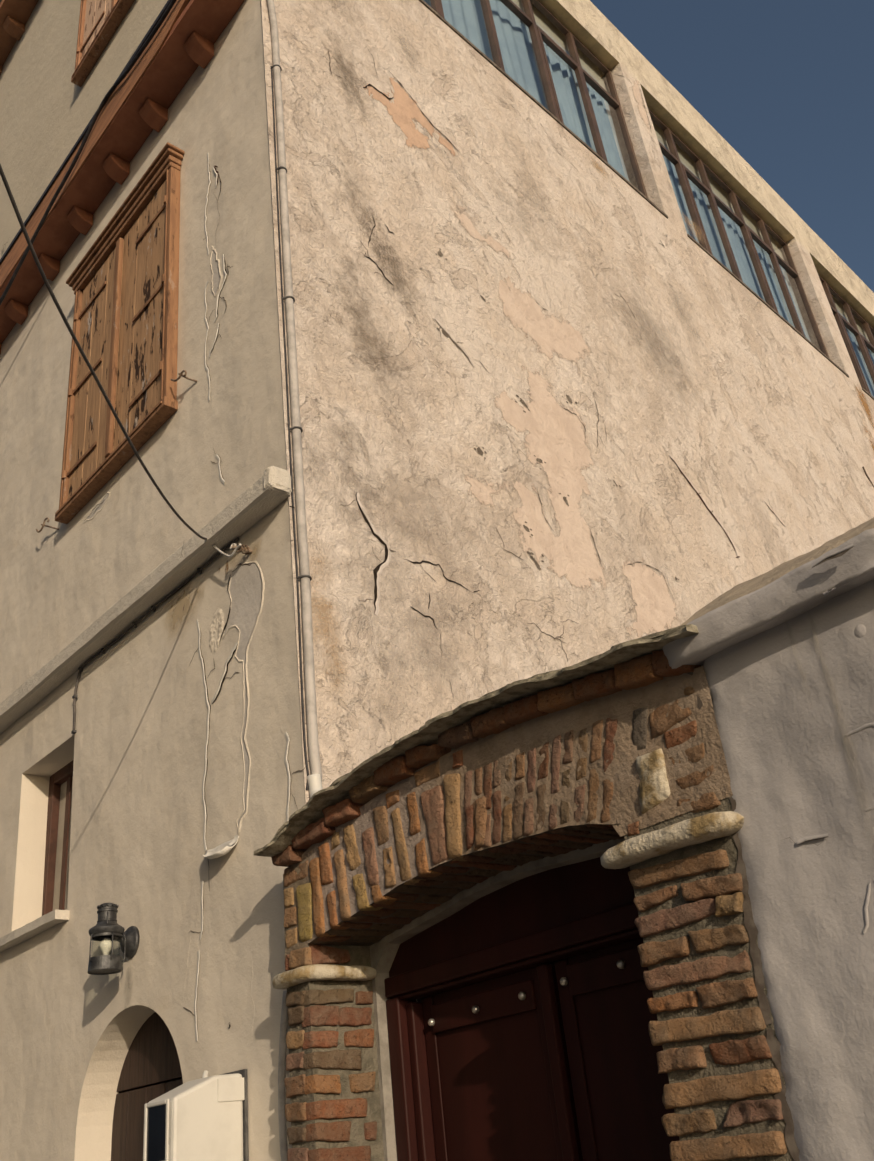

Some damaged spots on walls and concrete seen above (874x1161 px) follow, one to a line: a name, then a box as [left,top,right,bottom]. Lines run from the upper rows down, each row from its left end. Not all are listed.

peeling [363,71,456,156]
crack [203,153,233,402]
crack [341,492,479,697]
peeling [622,557,679,638]
crack [669,454,740,559]
crack [183,603,240,1042]